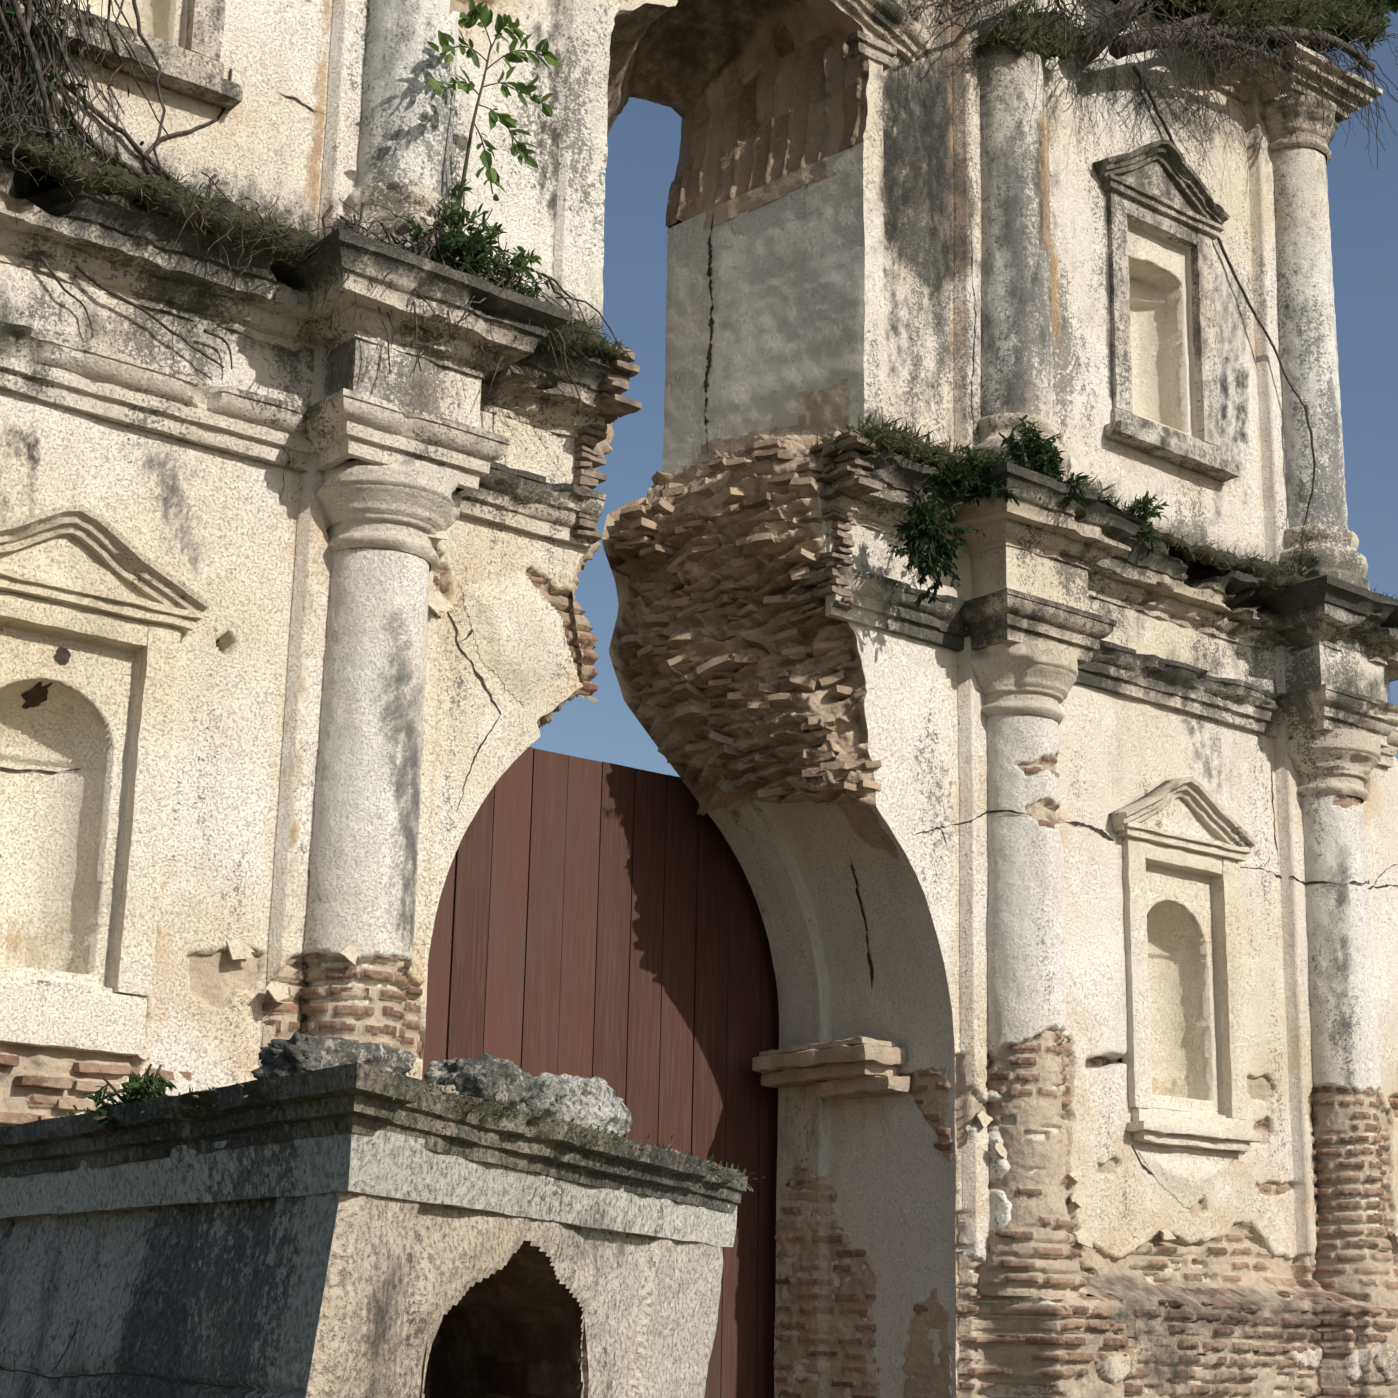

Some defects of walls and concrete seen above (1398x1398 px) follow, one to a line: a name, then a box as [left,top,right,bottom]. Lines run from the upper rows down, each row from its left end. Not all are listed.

water stain [883,47,953,374]
crack [704,213,714,451]
spalling [0,1042,152,1127]
spalling [186,939,423,1058]
water stain [384,613,424,943]
crack [447,612,501,810]
spalling [526,344,899,859]
crack [1065,821,1114,841]
crack [1242,756,1398,889]
water stain [1330,858,1351,913]
spalling [773,1166,881,1398]
spalling [899,1030,1398,1398]